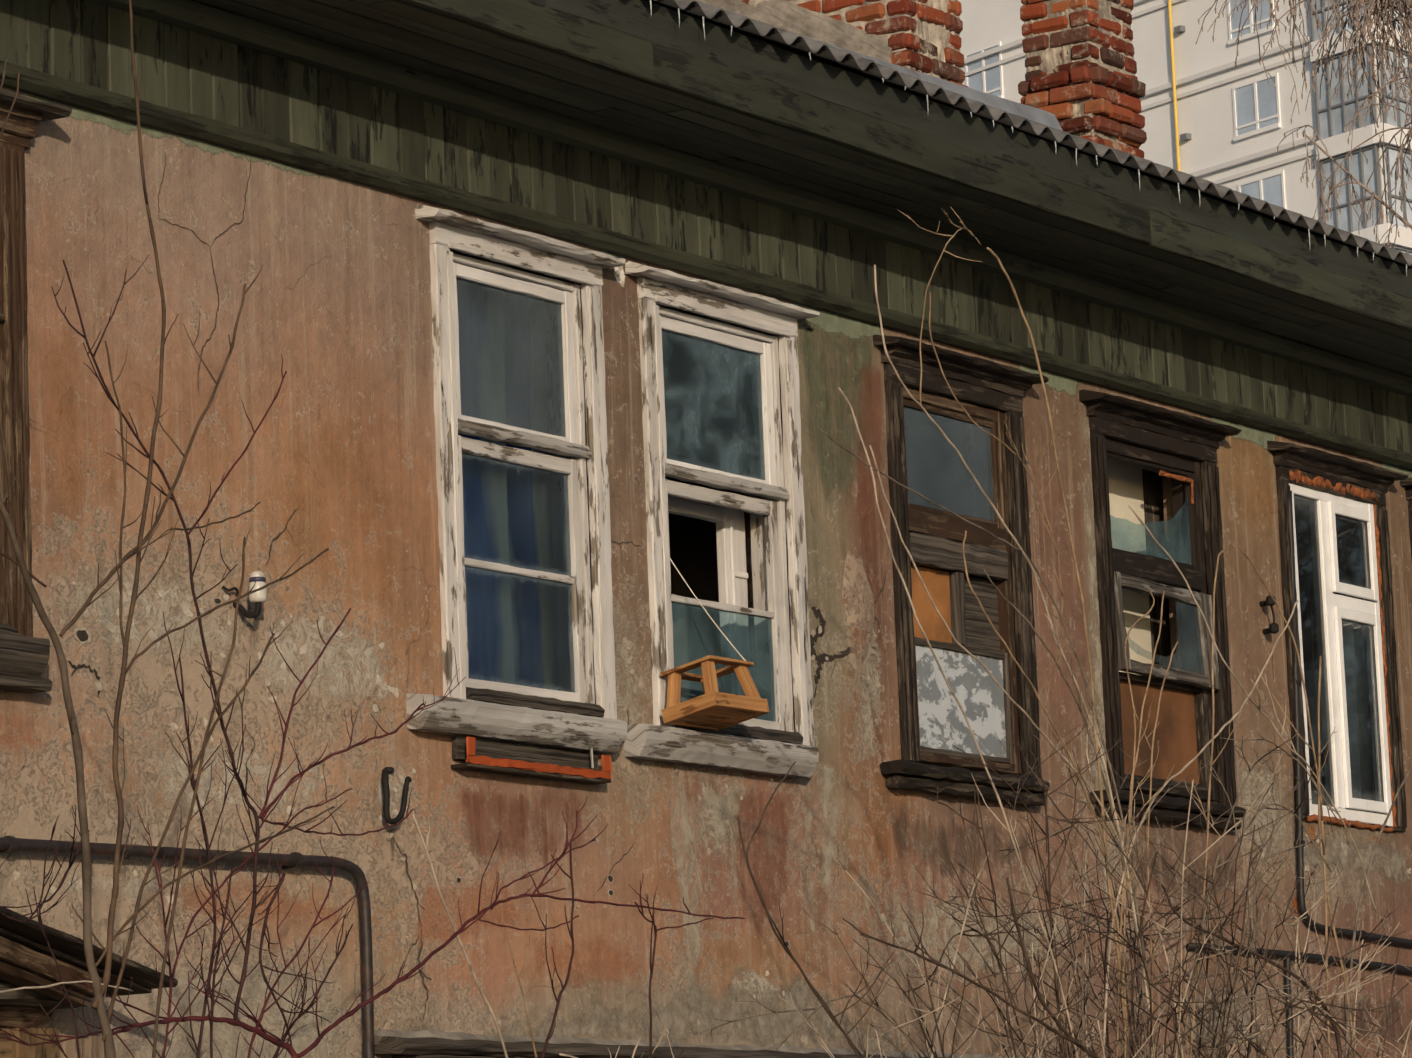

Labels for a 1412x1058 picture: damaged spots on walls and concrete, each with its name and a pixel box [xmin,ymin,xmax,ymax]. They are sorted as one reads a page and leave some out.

spalling [614,266,625,288]
peeling [72,572,240,658]
peeling [258,612,399,713]
peeling [615,637,644,724]
crack [810,573,886,697]
peeling [858,624,882,756]
peeling [48,868,174,904]
peeling [159,718,324,816]
peeling [377,769,416,821]
damp [671,786,704,979]
damp [805,767,837,900]